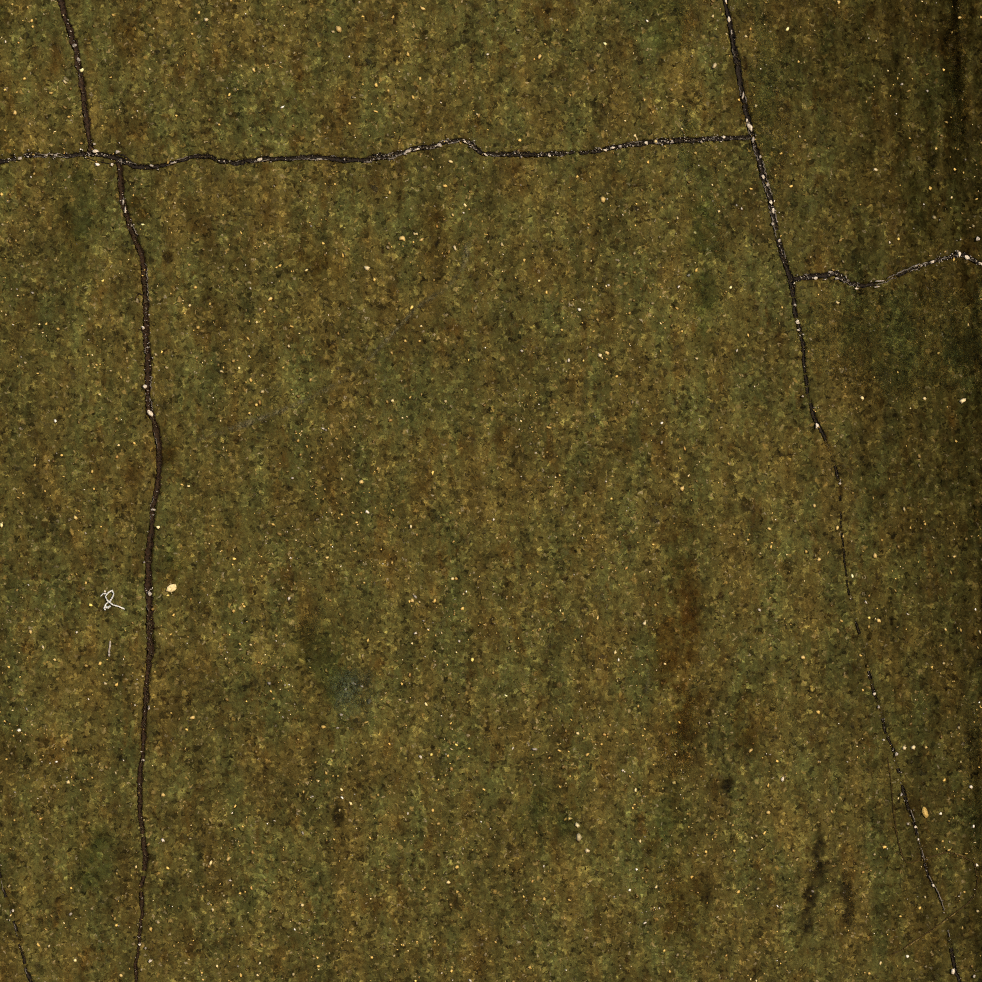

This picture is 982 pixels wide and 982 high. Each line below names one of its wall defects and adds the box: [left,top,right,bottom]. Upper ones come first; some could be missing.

crack [578,0,982,398]
leakage [928,0,982,251]
crack [0,0,576,871]
crack [809,400,841,485]
crack [840,511,854,609]
crack [0,872,33,982]
crack [133,876,147,982]
crack [867,671,978,982]